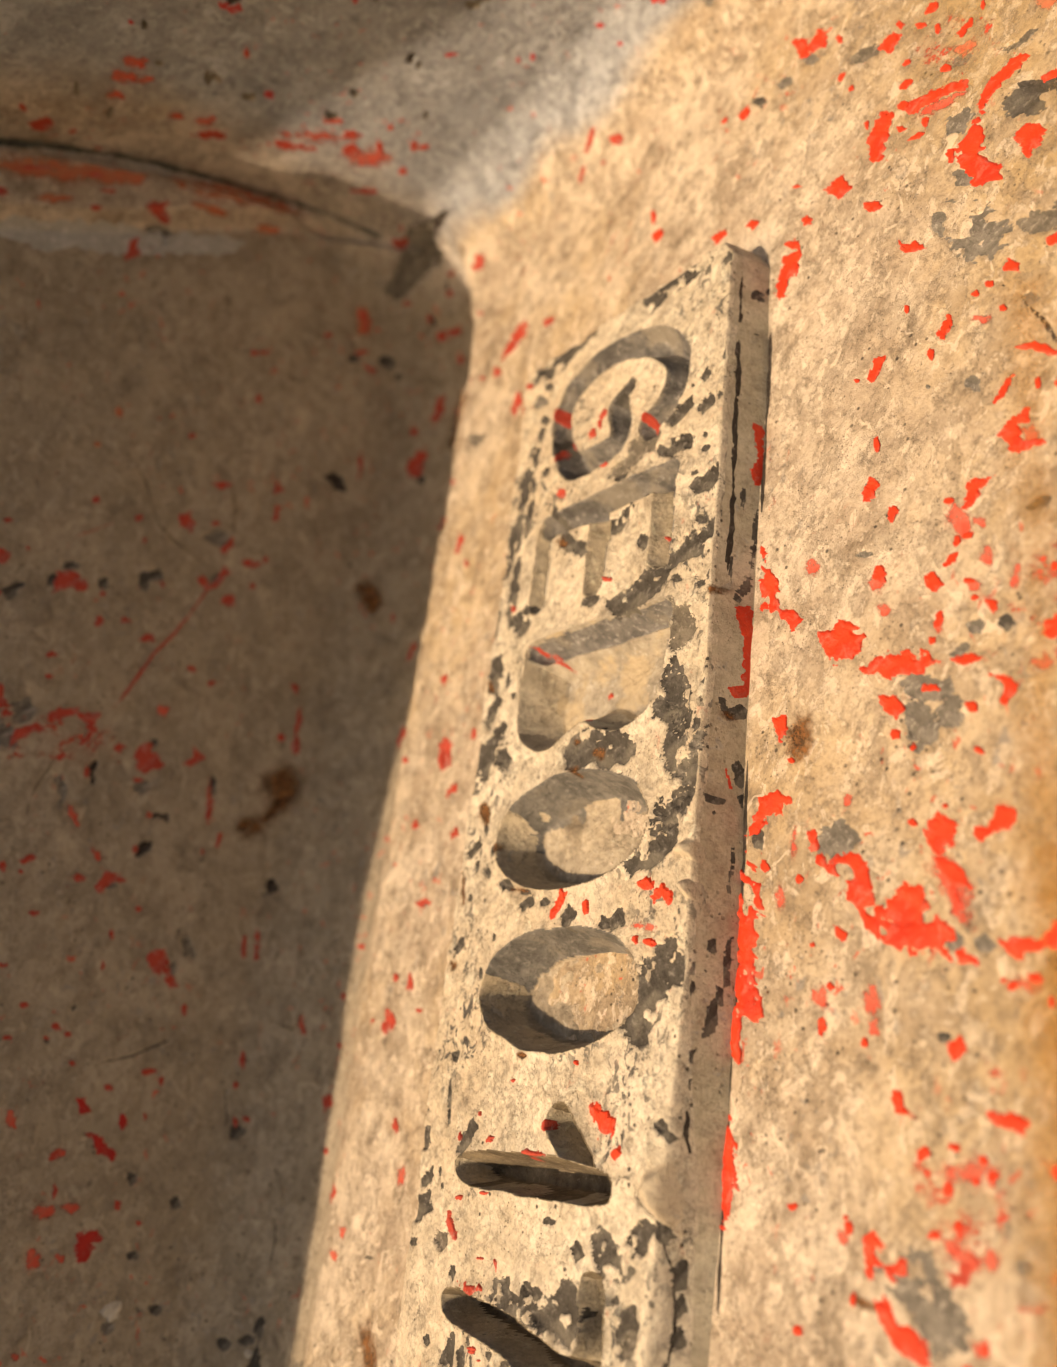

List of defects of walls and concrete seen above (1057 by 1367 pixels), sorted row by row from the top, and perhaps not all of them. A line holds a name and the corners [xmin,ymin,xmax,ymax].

peeling [751,215,813,302]
peeling [997,407,1046,453]
peeling [924,475,995,592]
peeling [817,534,1057,754]
corrosion [236,765,300,837]
peeling [791,794,1057,1008]
corrosion [360,1321,376,1367]
spalling [423,1331,509,1367]
spalling [397,1049,677,1361]
spalling [663,1259,689,1367]
peeling [720,1115,740,1231]
spalling [837,1143,1033,1367]